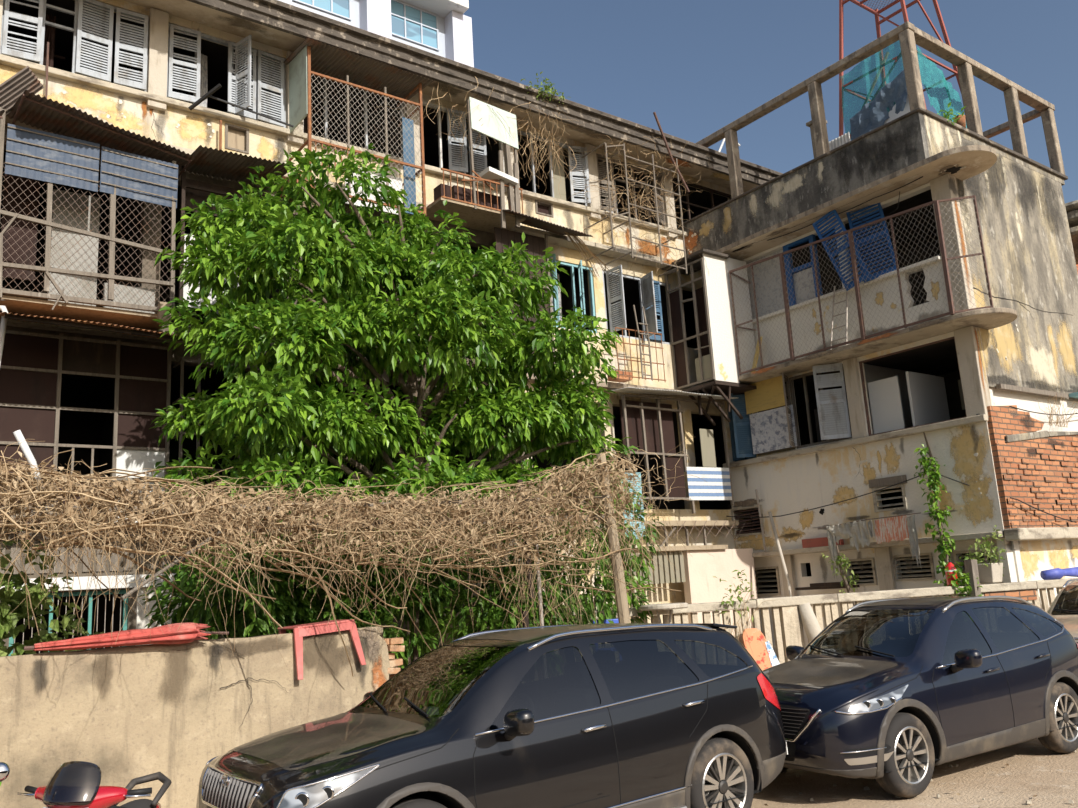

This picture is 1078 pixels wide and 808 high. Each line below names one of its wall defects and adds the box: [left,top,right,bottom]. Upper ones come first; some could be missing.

damp [925,115,961,150]
damp [818,134,910,180]
damp [750,175,805,213]
damp [958,157,1058,241]
damp [723,207,731,231]
rust [626,228,670,258]
peeling [973,281,985,308]
peeling [980,323,1076,388]
damp [987,376,1078,393]
peeling [931,427,993,524]
peeling [734,443,900,550]